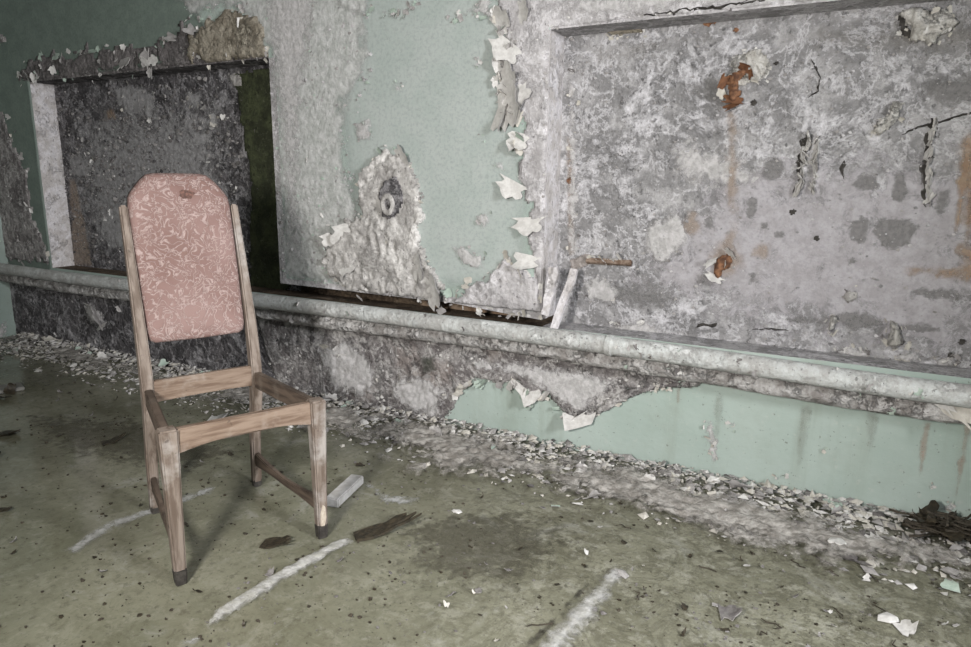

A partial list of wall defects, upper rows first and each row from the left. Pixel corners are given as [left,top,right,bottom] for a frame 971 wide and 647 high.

crack [644,0,765,16]
peeling [0,111,50,266]
peeling [16,4,270,282]
corrosion [716,62,753,111]
crack [902,112,971,135]
corrosion [956,137,971,224]
corrosion [585,253,633,266]
corrosion [703,247,735,284]
peeling [9,283,136,358]
peeling [148,316,701,431]